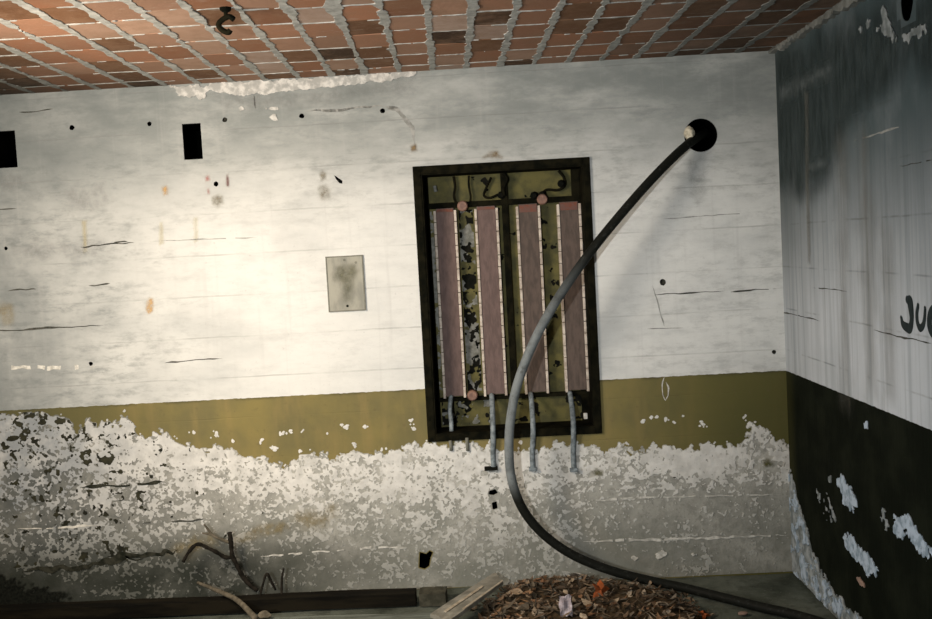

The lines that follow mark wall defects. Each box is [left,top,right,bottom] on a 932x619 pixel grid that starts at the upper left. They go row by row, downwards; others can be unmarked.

water stain [778,3,932,196]
peeling [0,409,862,619]
peeling [843,532,879,588]
peeling [880,508,932,559]